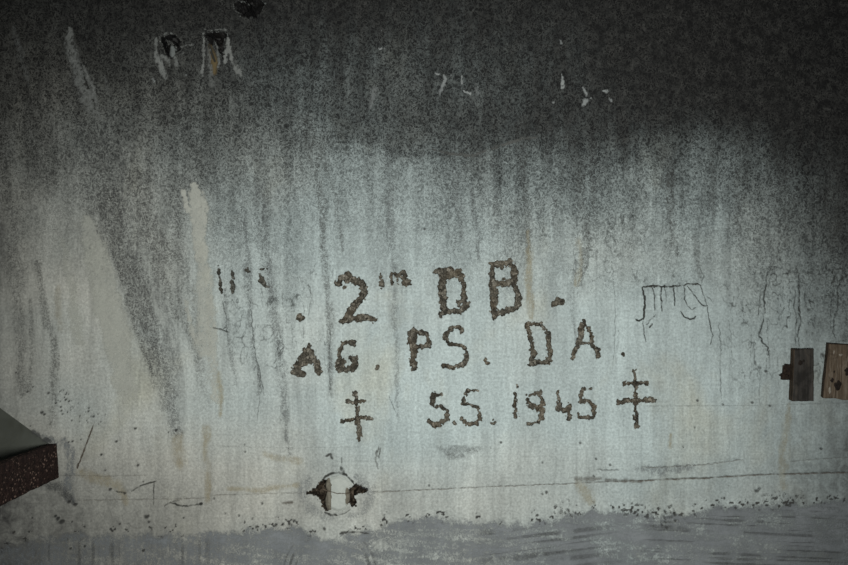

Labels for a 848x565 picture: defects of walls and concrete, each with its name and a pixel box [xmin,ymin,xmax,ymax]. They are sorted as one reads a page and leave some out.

spalling [152,32,192,82]
spalling [200,28,242,86]
spalling [306,467,368,516]